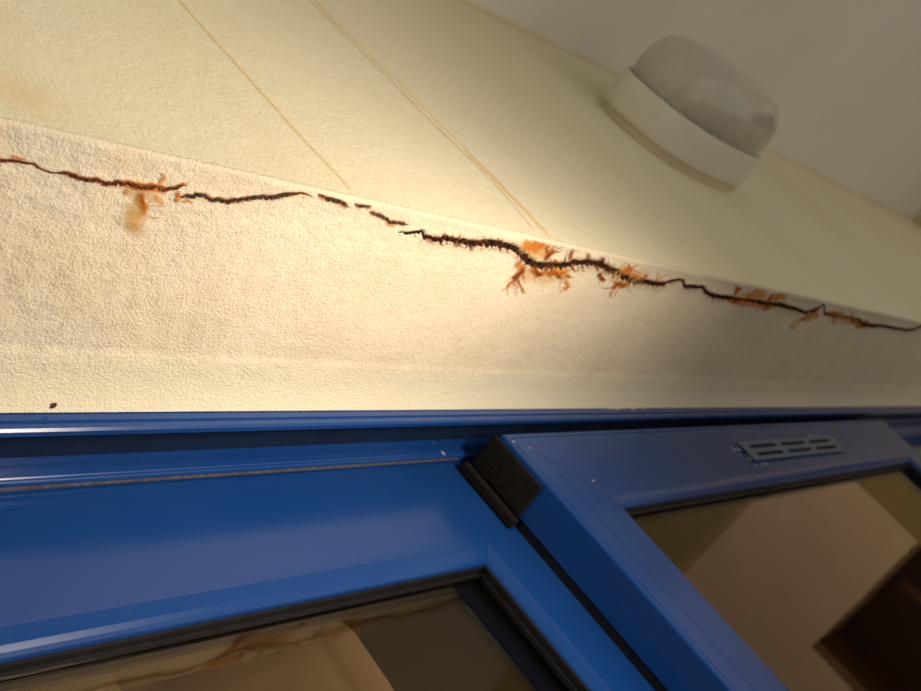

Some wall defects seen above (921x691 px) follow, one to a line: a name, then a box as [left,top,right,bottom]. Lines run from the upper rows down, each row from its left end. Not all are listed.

corrosion [121,172,193,226]
crack [0,158,921,333]
corrosion [505,240,587,296]
corrosion [597,256,666,297]
corrosion [730,284,787,311]